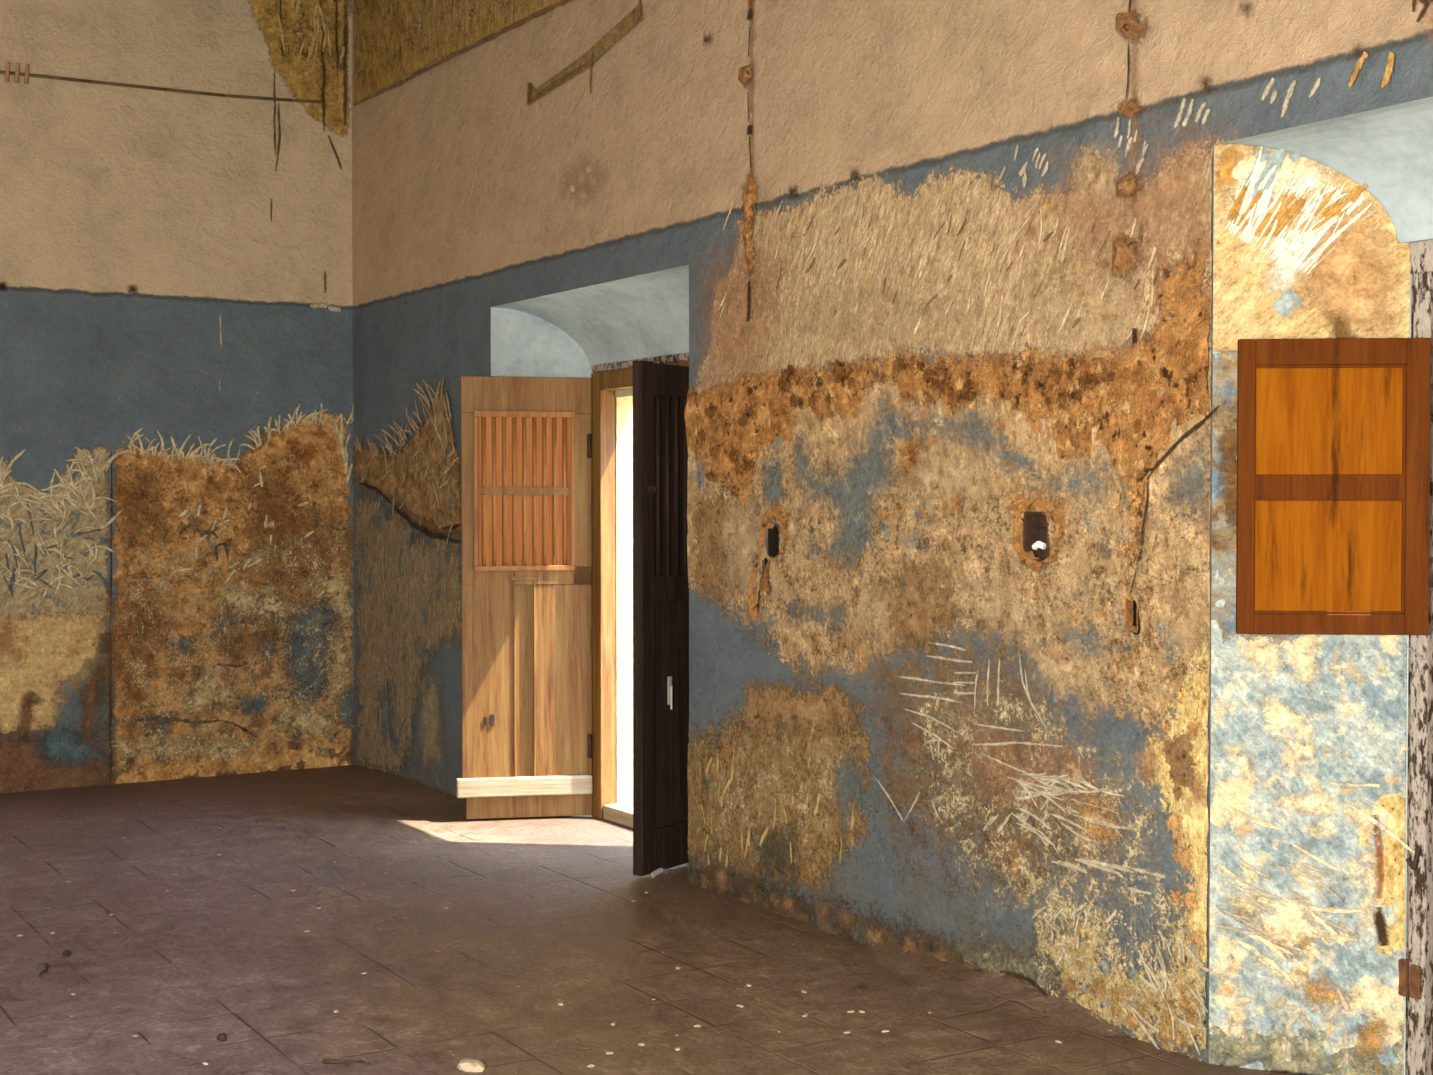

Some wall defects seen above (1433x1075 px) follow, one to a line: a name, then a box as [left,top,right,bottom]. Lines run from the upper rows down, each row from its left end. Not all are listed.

peeling [248,0,570,137]
crack [745,101,753,168]
crack [746,8,754,56]
crack [744,281,752,322]
crack [357,482,461,543]
crack [1126,406,1219,593]
flaking render [0,402,461,784]
flaking render [685,129,1415,1075]